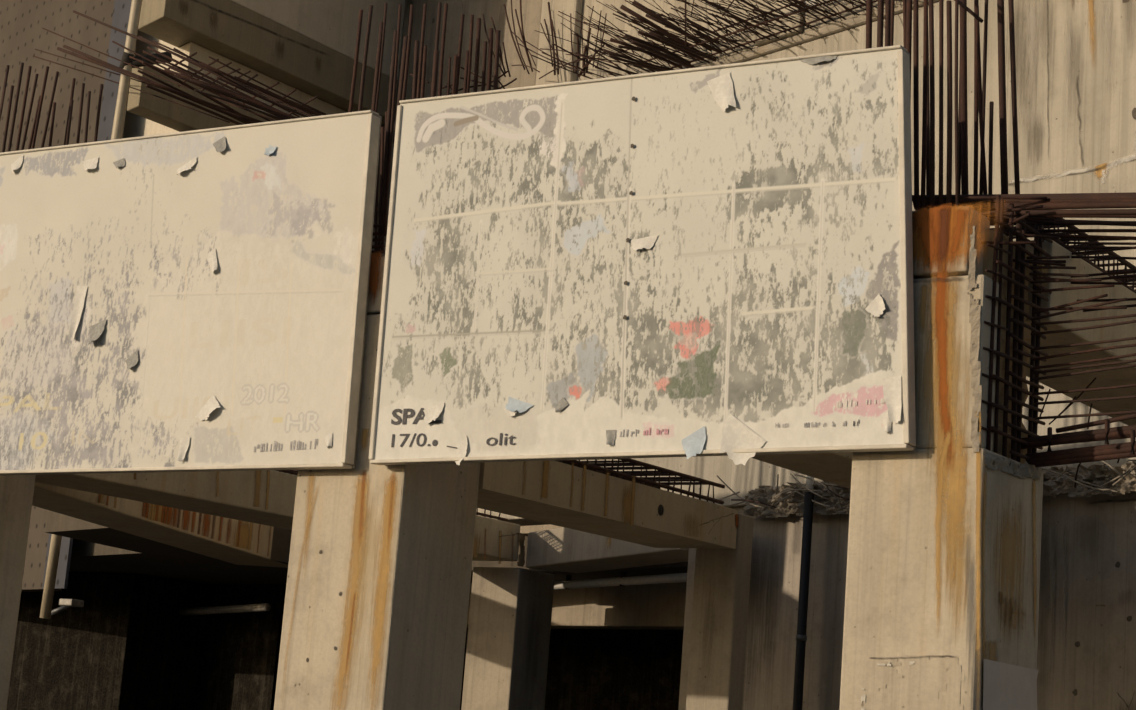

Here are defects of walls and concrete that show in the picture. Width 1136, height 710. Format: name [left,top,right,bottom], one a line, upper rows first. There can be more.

spalling [348,0,1136,480]
rust [142,502,261,552]
rust [337,477,369,710]
rust [371,478,396,693]
rust [912,204,997,690]